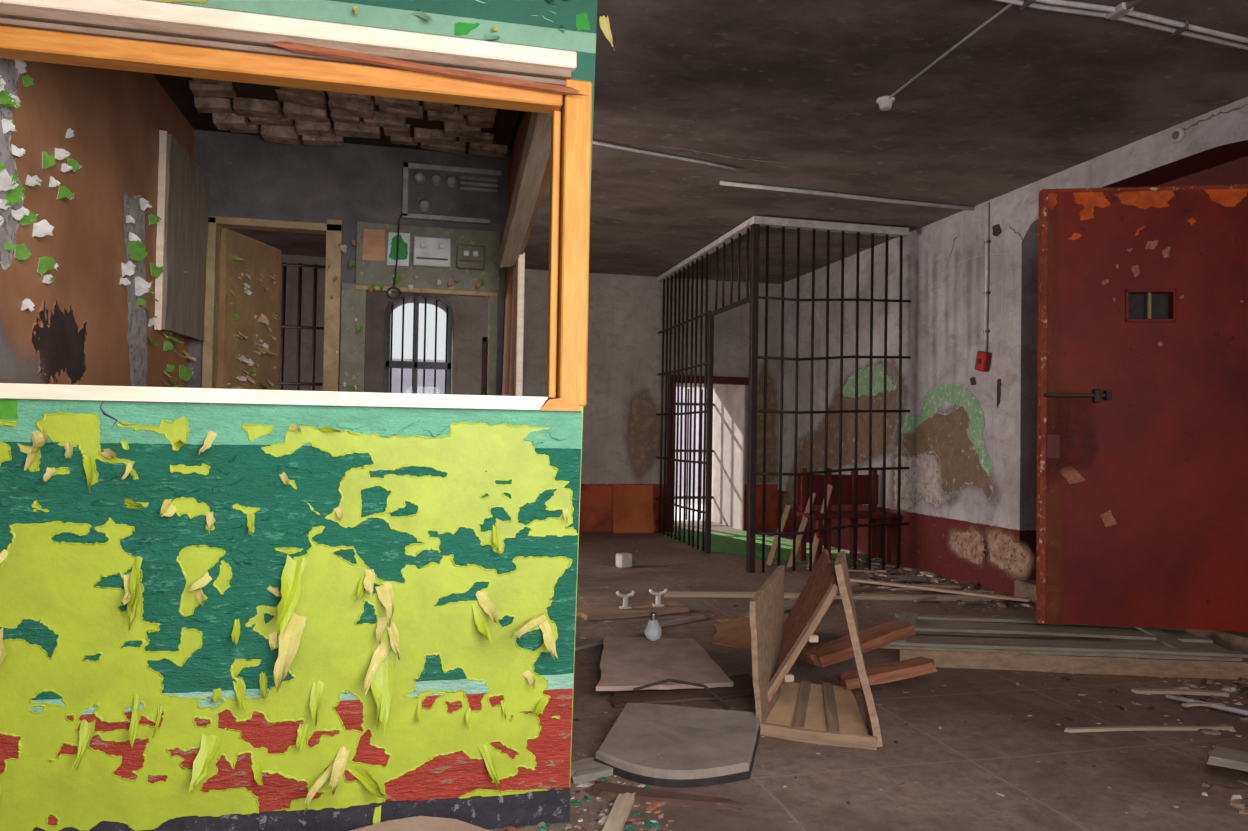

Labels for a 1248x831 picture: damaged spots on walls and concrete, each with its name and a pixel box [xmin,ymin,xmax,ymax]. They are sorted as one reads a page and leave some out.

peeling [482,27,501,41]
peeling [599,15,615,50]
peeling [0,58,83,284]
flaking render [782,359,1002,512]
peeling [0,195,582,824]
peeling [949,530,1031,579]
peeling [45,813,60,828]